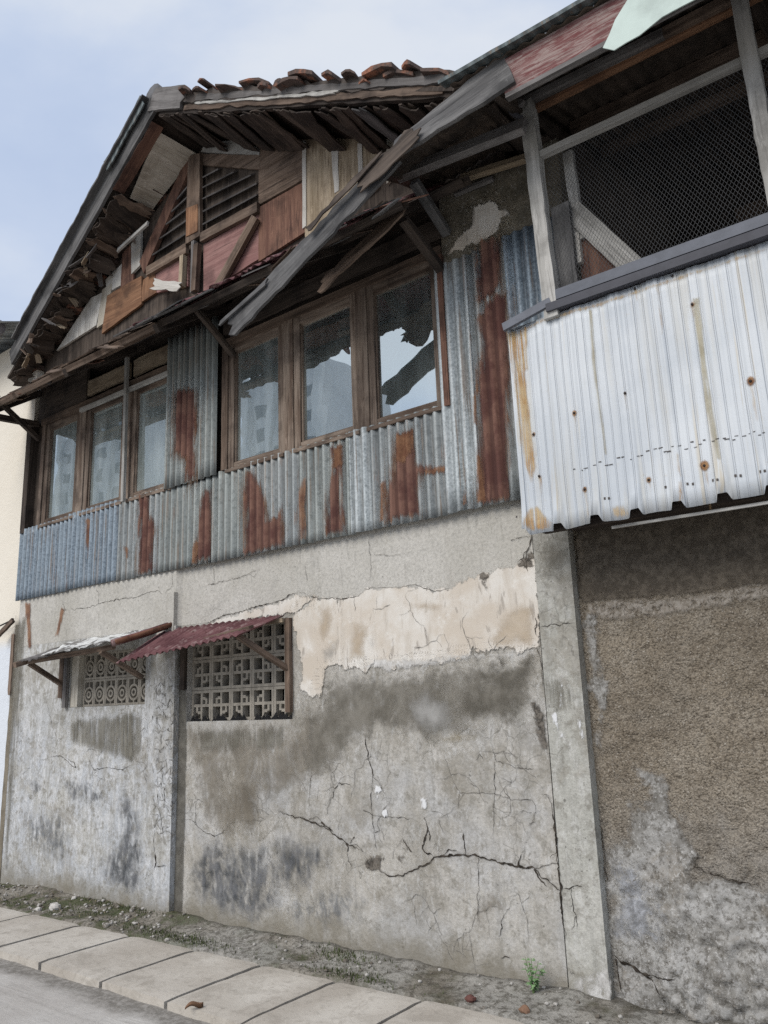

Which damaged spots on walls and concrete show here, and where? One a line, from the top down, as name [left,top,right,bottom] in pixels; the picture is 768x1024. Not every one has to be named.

peeling [448,200,509,254]
rust [463,237,540,504]
rust [171,389,197,478]
rust [380,430,445,522]
rust [125,494,154,573]
rust [192,489,211,563]
crack [208,542,505,679]
peeling [206,552,540,698]
leakage [72,715,141,759]
leakage [110,800,139,887]
crack [46,677,582,974]
leakage [174,661,528,912]